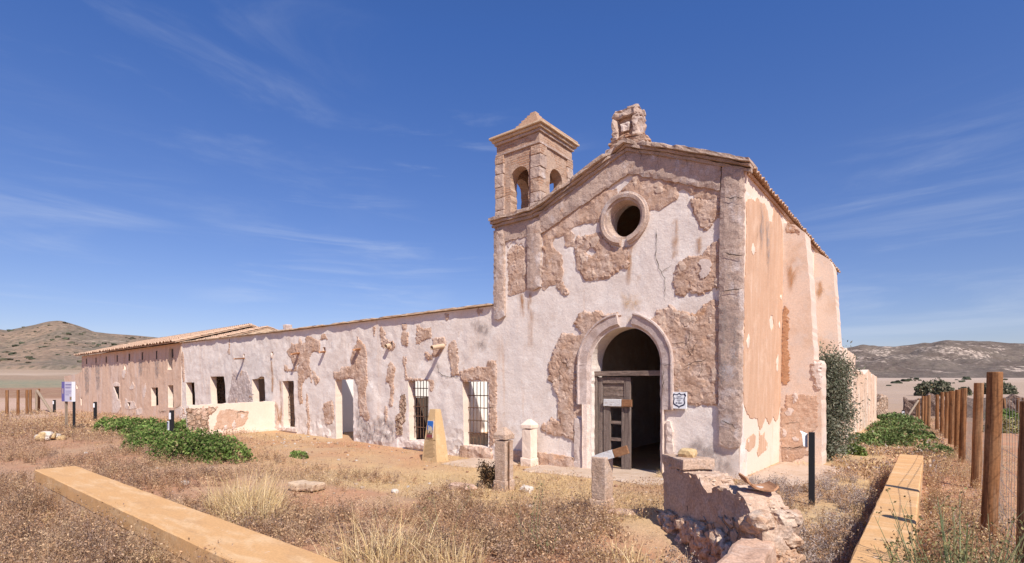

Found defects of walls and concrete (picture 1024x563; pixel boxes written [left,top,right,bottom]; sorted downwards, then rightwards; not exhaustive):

peeling [175,370,254,433]
peeling [284,333,327,435]
peeling [333,323,498,447]
peeling [507,237,527,296]
peeling [541,310,621,443]
peeling [541,174,721,406]
peeling [743,197,819,462]